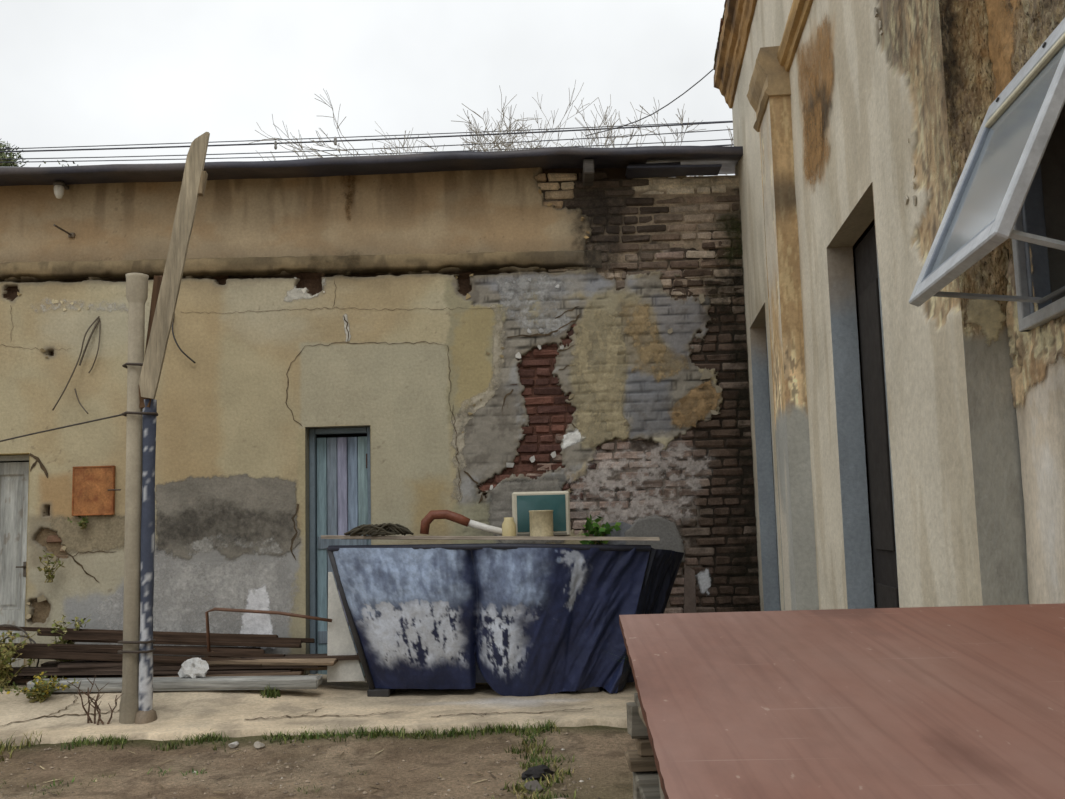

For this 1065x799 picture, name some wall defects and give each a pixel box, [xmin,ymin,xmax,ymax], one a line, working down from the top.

damp [798,18,834,184]
damp [942,0,961,84]
spalling [284,273,326,302]
spalling [451,171,761,614]
peeling [967,259,1065,408]
spalling [35,528,69,562]